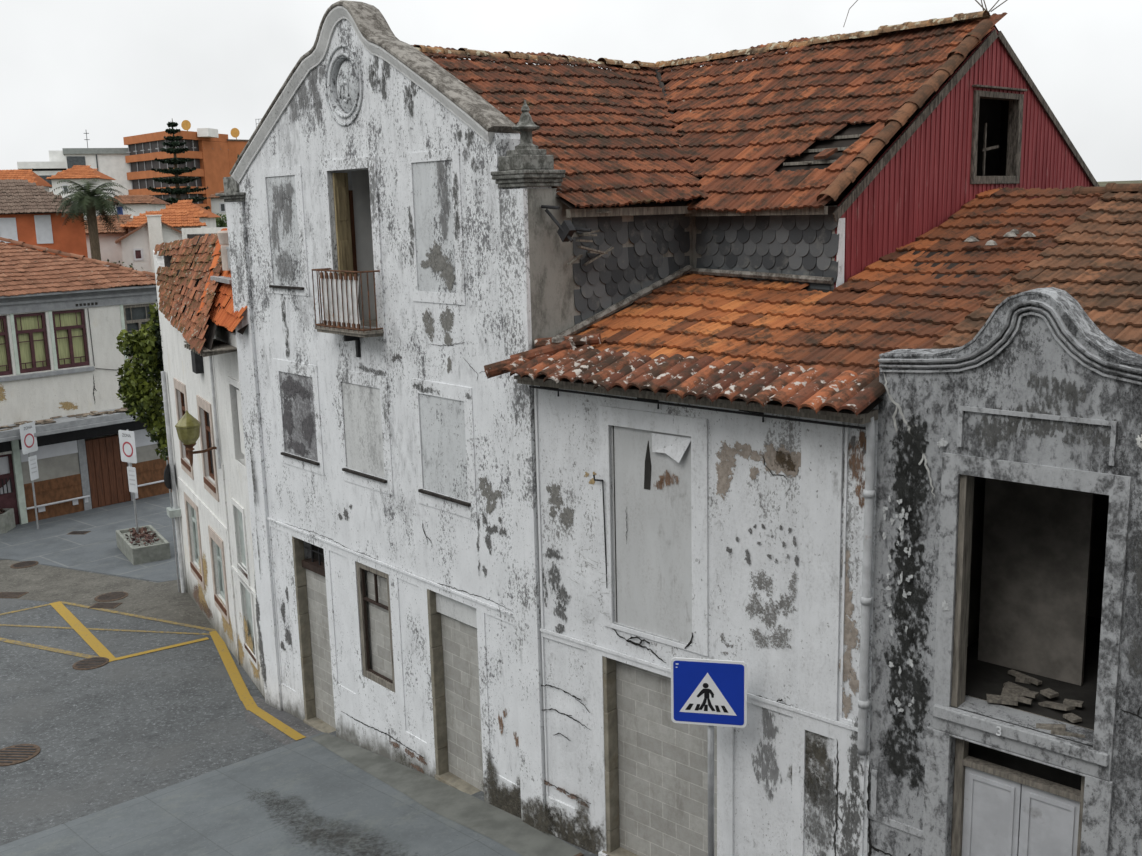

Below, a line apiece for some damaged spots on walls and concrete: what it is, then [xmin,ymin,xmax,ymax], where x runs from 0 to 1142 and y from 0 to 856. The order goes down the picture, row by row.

peeling [421,241,455,373]
peeling [479,477,507,554]
peeling [546,484,574,531]
peeling [715,440,801,500]
peeling [726,524,799,651]
damp [882,407,931,797]
damp [481,751,604,855]
crack [541,684,590,741]
damp [752,707,782,799]
damp [799,717,866,856]
crack [834,741,911,856]